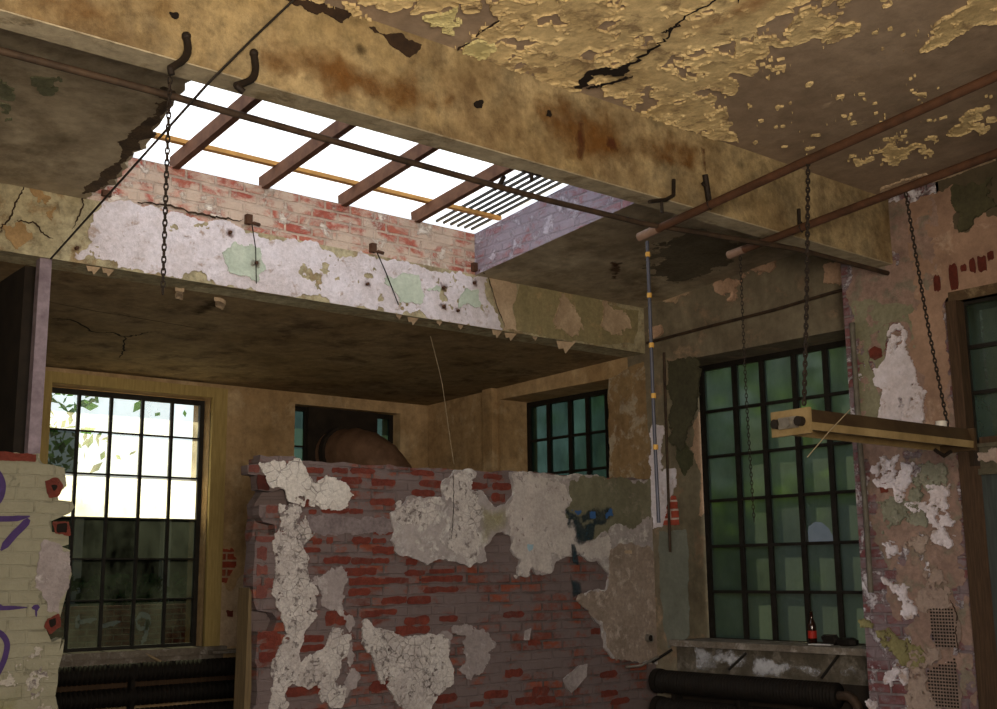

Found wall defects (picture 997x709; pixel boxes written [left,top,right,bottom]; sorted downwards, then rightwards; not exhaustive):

spalling [82,86,176,194]
damp [321,58,416,105]
peeling [288,0,861,143]
crack [573,0,739,89]
peeling [847,95,997,167]
peeling [917,0,997,53]
peeling [75,200,664,354]
flaking render [850,159,997,427]
flaking render [35,521,71,634]
spalling [45,477,63,498]
peeling [249,356,704,709]
peeling [870,454,956,620]